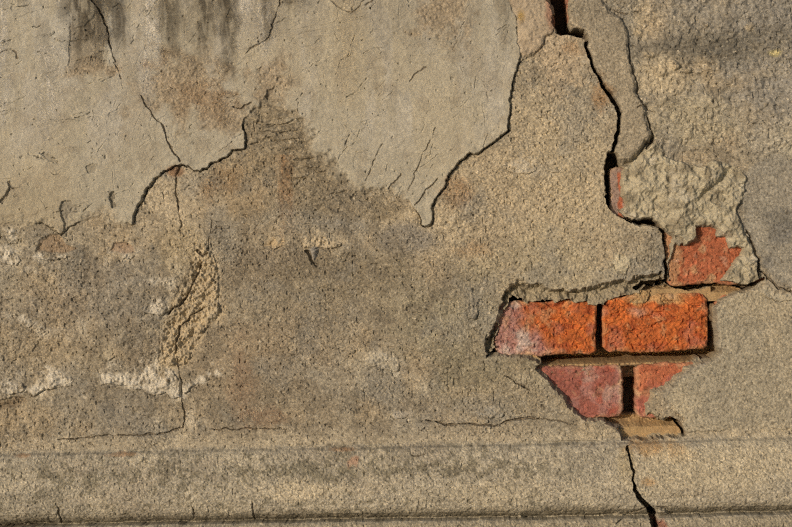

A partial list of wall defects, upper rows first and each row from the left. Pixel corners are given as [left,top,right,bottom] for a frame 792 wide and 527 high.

water stain [72,0,99,41]
water stain [143,0,175,85]
water stain [219,0,251,37]
crack [90,0,183,238]
crack [546,0,792,293]
peeling [414,38,792,443]
crack [58,213,230,441]
crack [425,416,579,428]
crack [669,417,687,437]
crack [626,445,670,527]